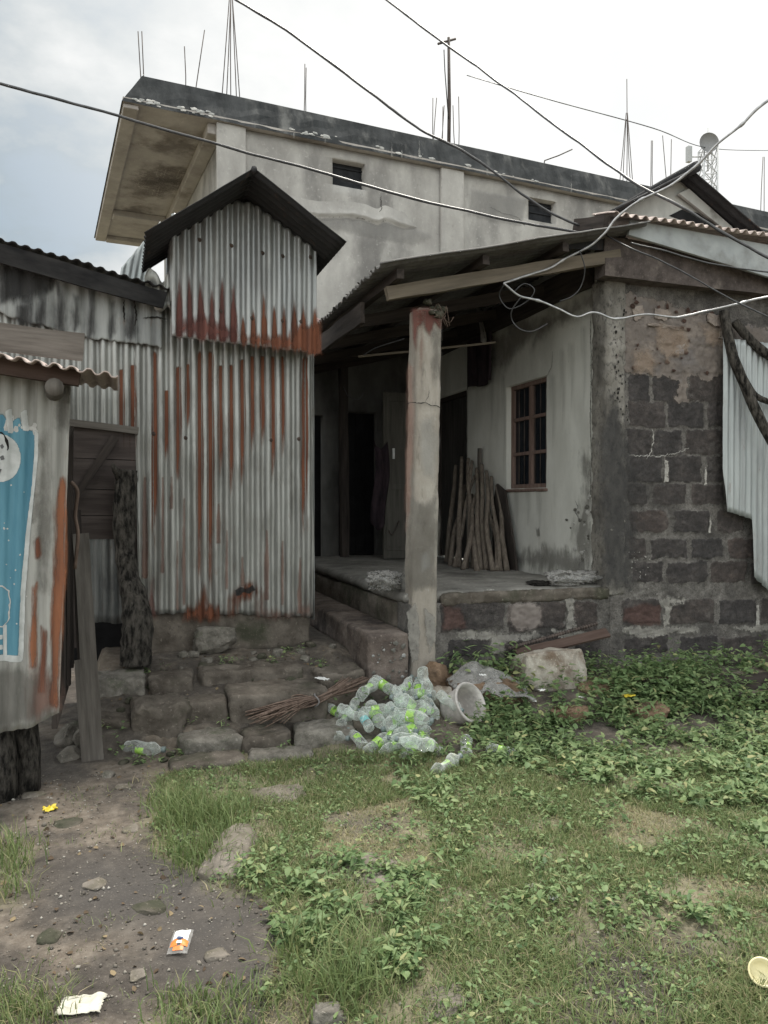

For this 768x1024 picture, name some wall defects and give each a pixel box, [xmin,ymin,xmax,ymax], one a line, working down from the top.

rust [119,365,137,427]
rust [142,280,322,622]
crack [634,430,689,457]
rust [29,478,67,708]